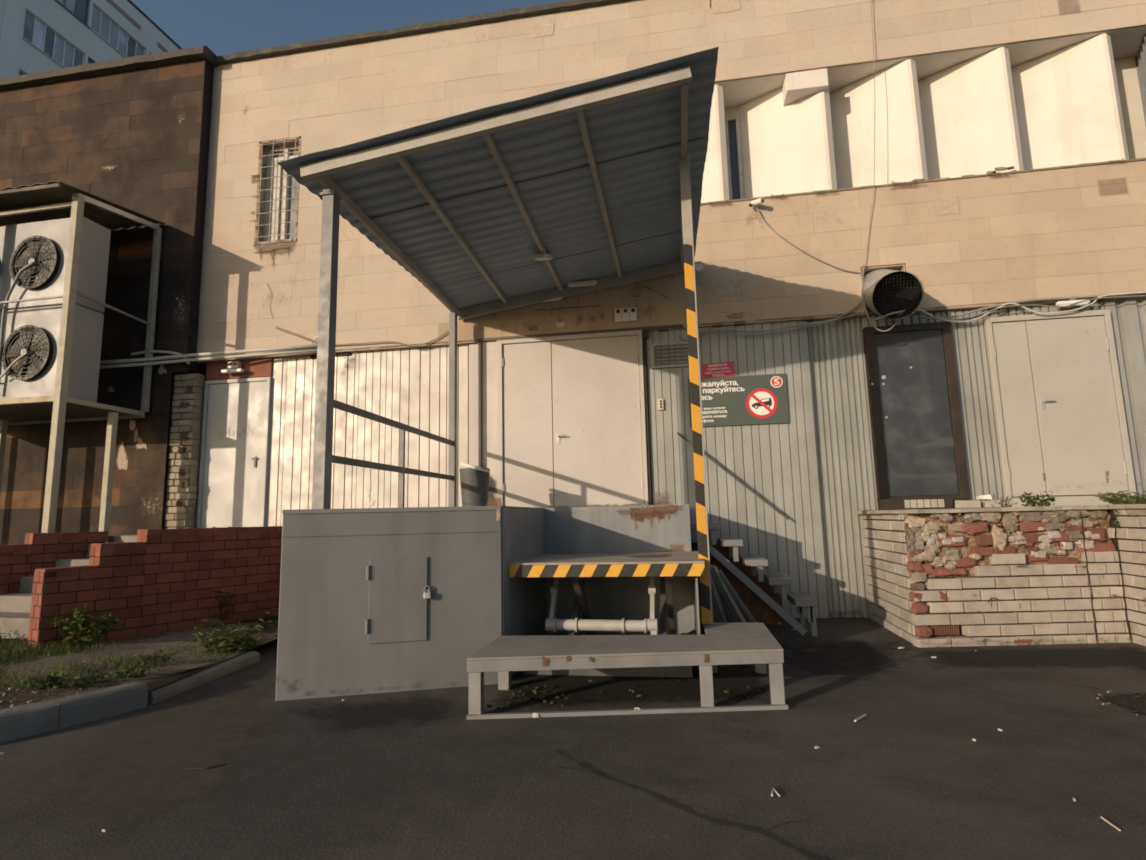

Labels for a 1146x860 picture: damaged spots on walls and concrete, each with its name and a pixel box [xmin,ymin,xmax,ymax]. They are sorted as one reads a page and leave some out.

rust [618,497,682,522]
spalling [903,509,1116,637]